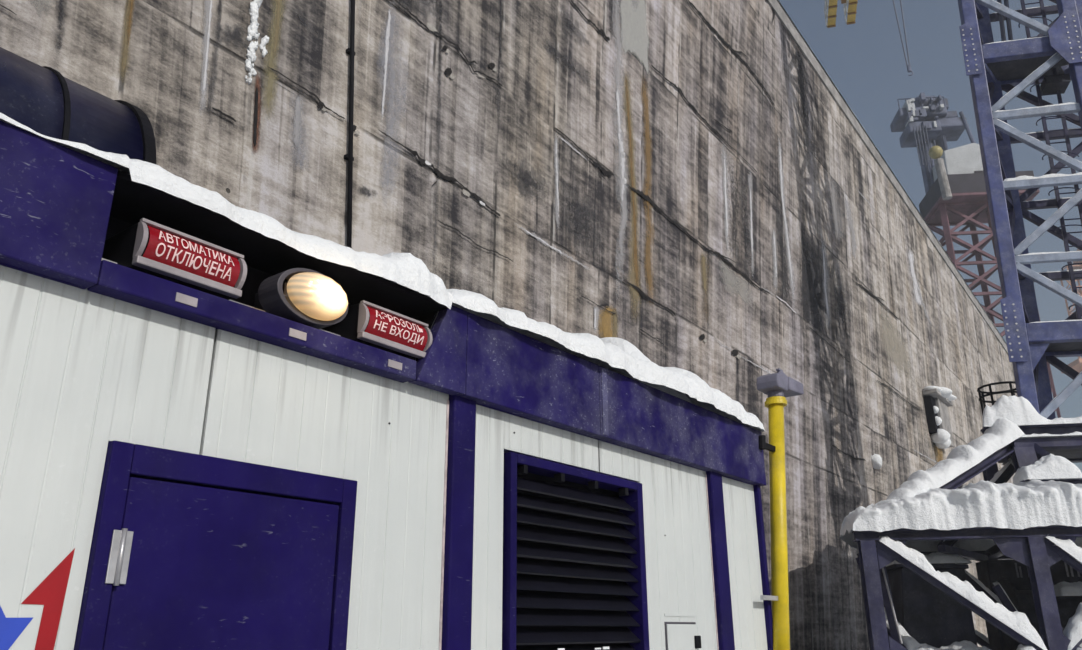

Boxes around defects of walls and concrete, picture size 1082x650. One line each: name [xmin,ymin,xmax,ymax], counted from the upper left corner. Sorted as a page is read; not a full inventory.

damp [380,10,406,185]
damp [521,227,586,267]
damp [554,136,587,223]
rust [624,78,653,311]